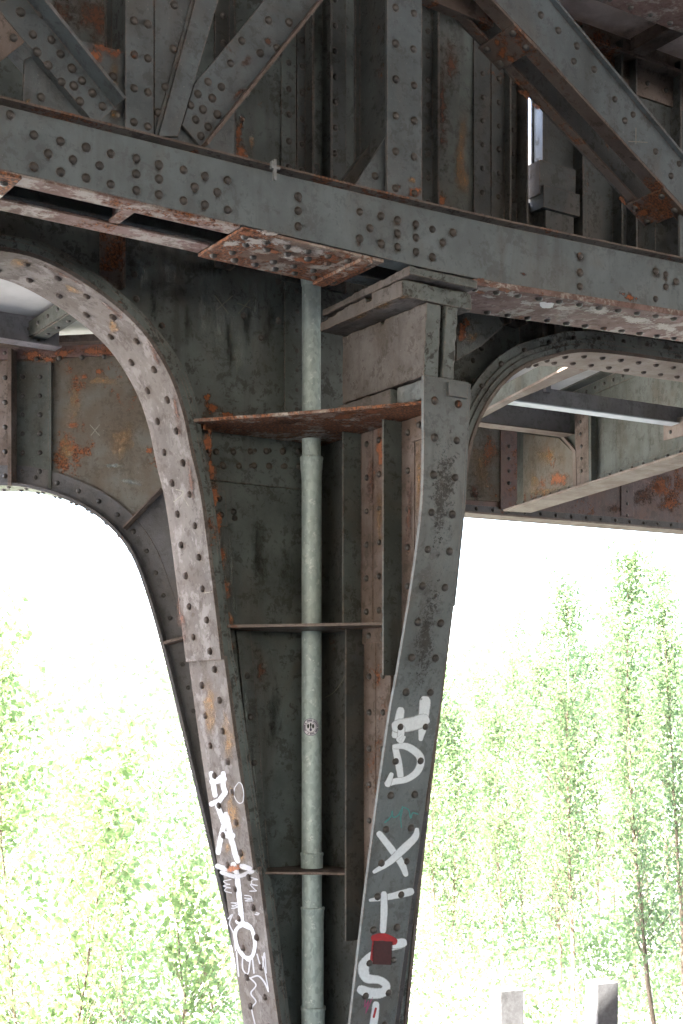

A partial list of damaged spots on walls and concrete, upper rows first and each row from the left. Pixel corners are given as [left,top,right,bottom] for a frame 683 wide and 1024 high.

peeling [223,230,327,262]
peeling [478,291,677,333]
rust [202,393,233,598]